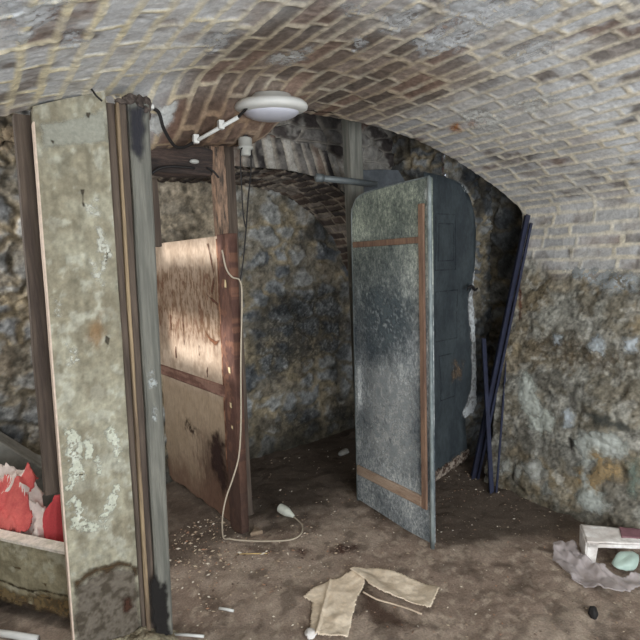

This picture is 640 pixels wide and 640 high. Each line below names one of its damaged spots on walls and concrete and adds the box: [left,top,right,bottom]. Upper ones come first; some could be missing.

water stain [130,107,146,157]
peeling [64,426,120,532]
water stain [211,432,227,490]
water stain [0,561,141,640]
water stain [150,575,171,635]